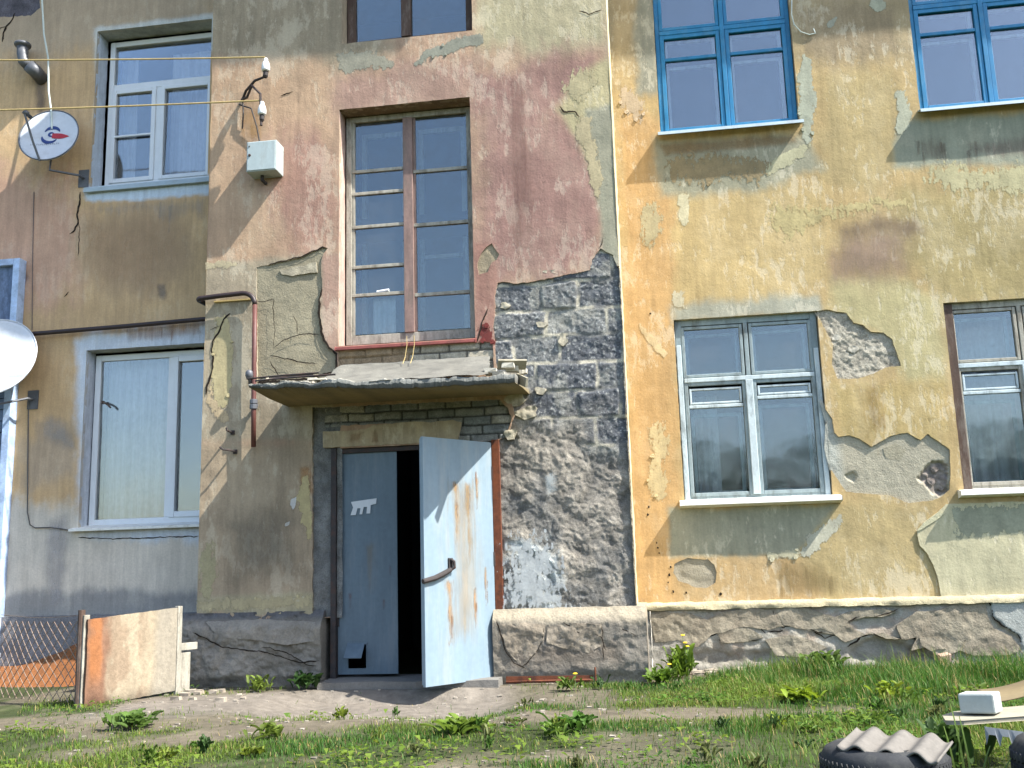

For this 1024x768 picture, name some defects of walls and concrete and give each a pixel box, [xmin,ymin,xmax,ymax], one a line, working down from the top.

peeling [664,54,817,226]
crack [70,194,81,254]
crack [205,313,230,394]
spalling [814,310,900,379]
spalling [196,244,637,645]
peeling [646,420,671,516]
spalling [820,399,950,503]
corrosion [453,474,478,553]
spalling [667,558,722,596]
crack [194,633,319,666]
crack [751,609,916,647]
crack [988,602,1023,647]